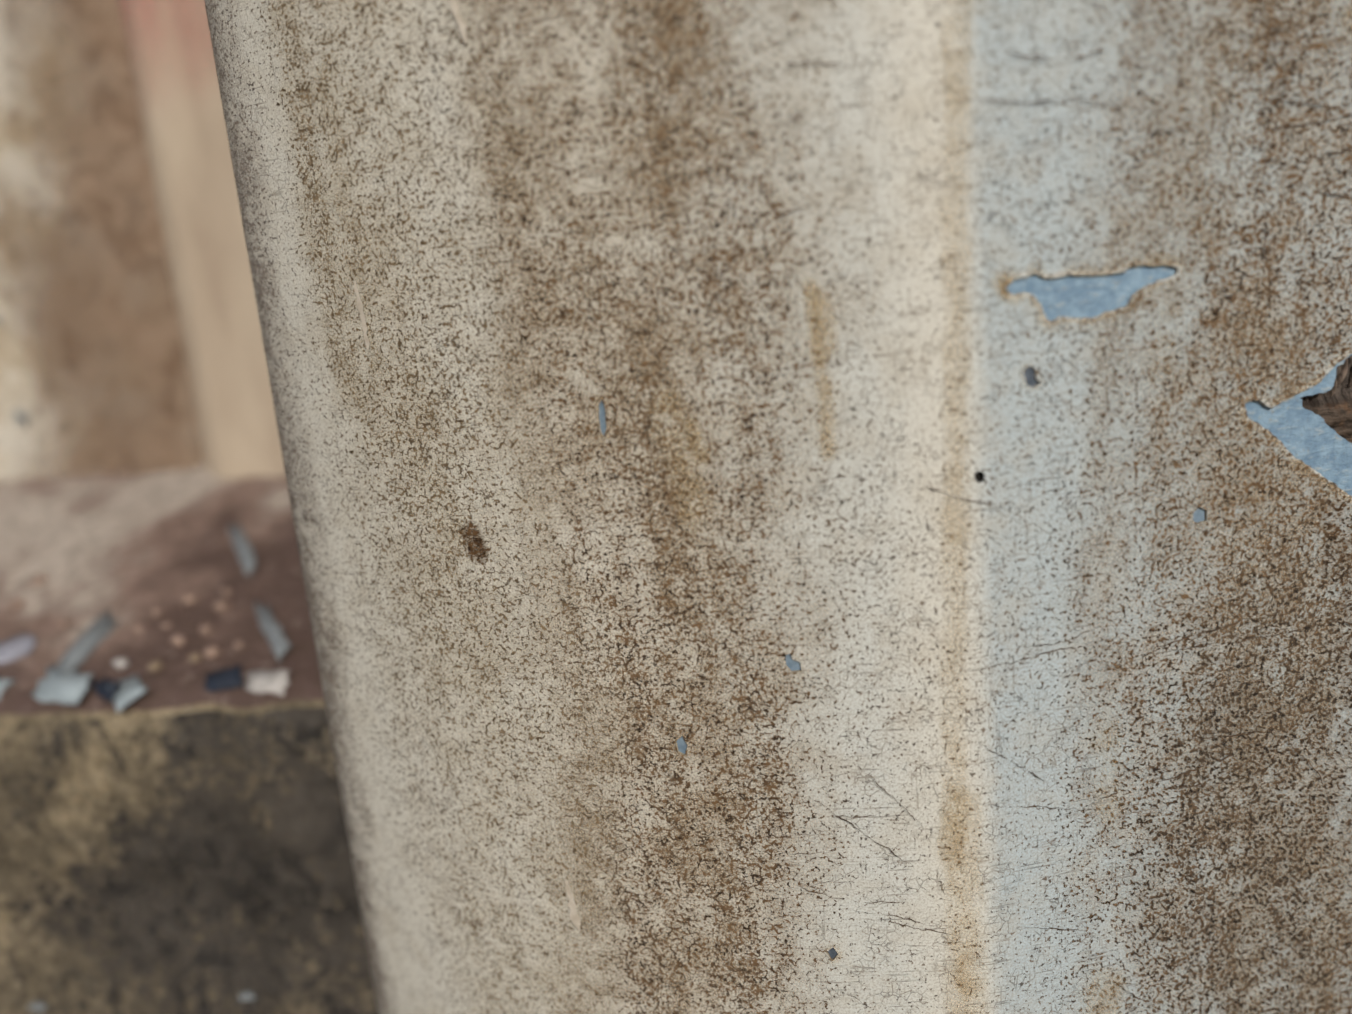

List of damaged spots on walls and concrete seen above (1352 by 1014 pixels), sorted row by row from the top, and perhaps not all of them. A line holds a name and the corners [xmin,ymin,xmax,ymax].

leakage [204,0,400,1014]
leakage [257,0,882,1014]
peeling [1000,259,1182,327]
leakage [1052,0,1352,1014]
peeling [1239,348,1352,504]